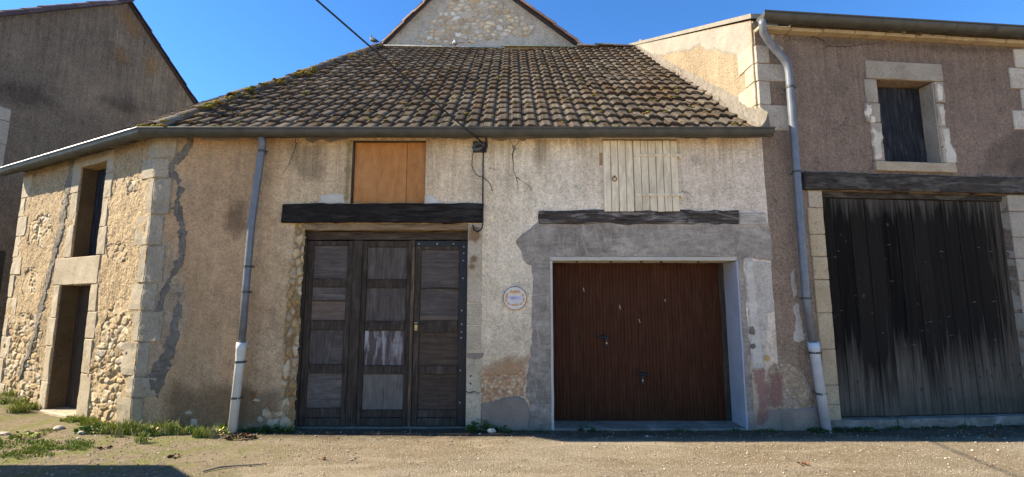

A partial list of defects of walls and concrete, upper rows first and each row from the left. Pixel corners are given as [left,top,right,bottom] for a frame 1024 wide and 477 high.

peeling [864,105,883,159]
crack [509,139,533,192]
spalling [744,260,812,425]
spalling [481,371,526,403]